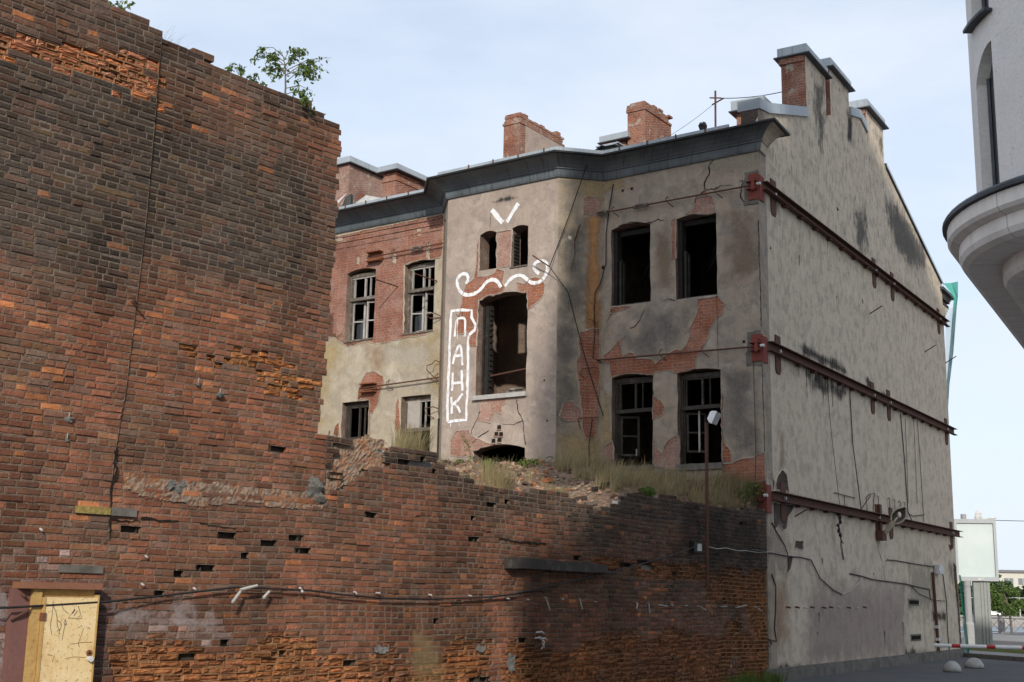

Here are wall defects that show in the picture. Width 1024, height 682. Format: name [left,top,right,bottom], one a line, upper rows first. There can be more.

spalling [0,31,166,114]
peeling [670,189,716,259]
damp [886,203,925,266]
crack [109,37,246,541]
spalling [178,337,322,401]
peeling [576,295,726,465]
damp [793,344,846,399]
spalling [123,371,435,509]
peeling [449,398,508,458]